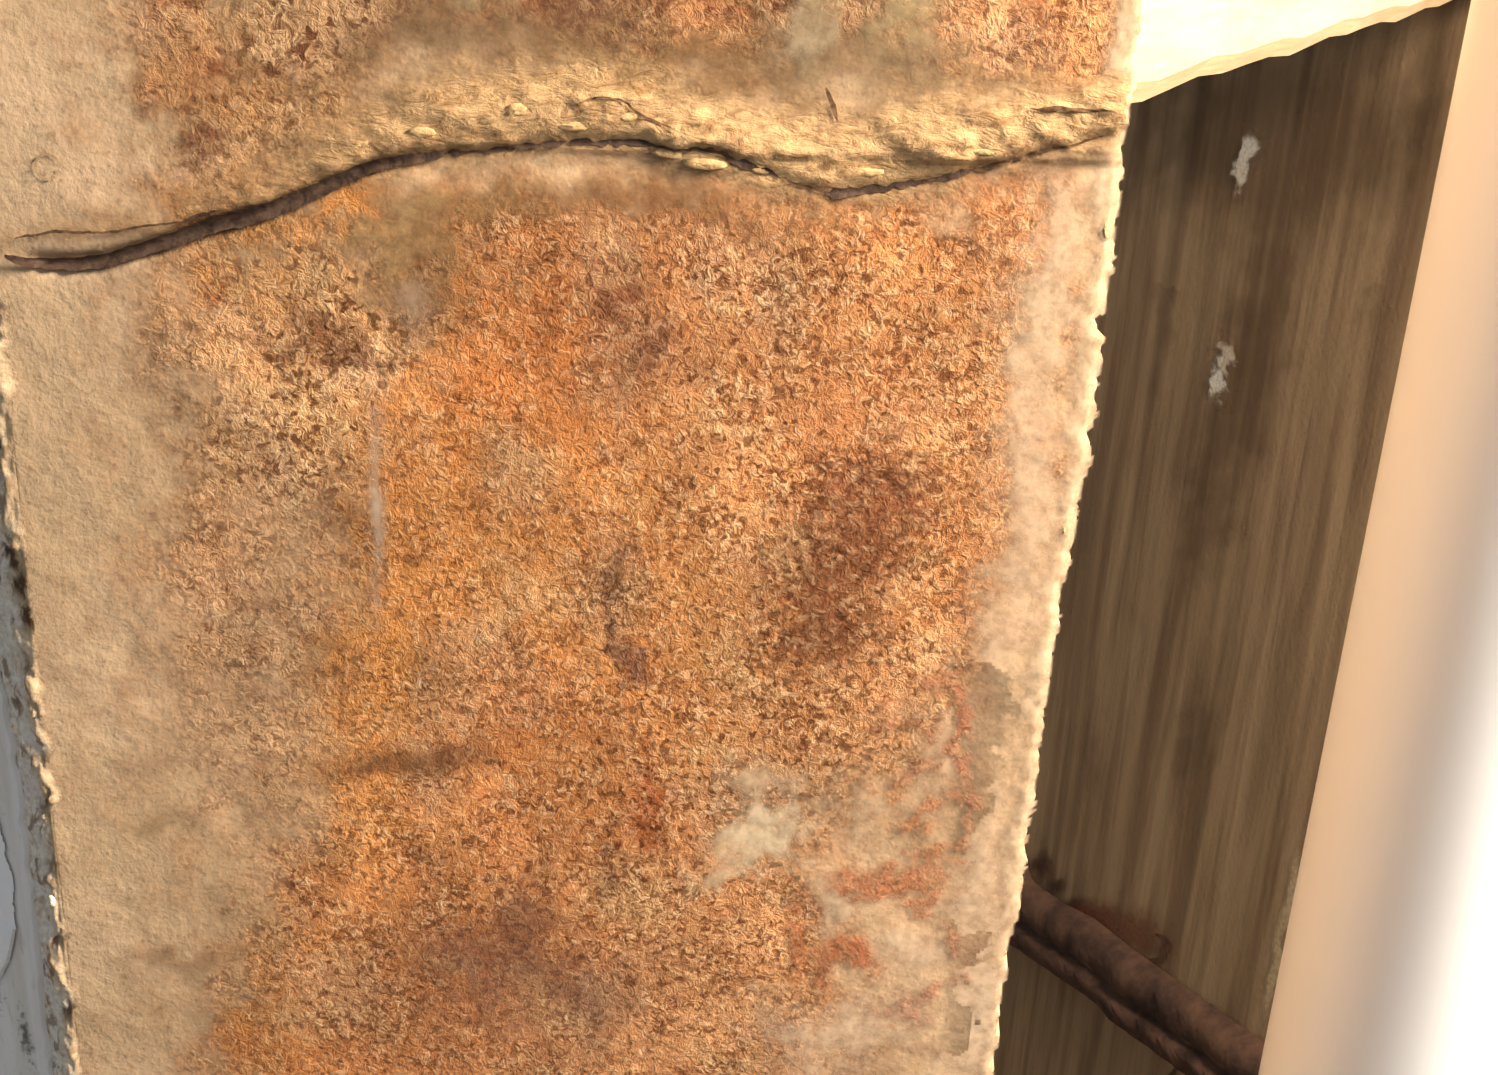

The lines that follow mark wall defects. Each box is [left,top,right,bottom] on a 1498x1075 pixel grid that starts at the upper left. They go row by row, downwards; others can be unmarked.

crack [4,96,1116,272]
crack [825,87,838,121]
spalling [0,277,82,1075]
corrosion [118,0,1139,1075]
leakage [752,453,935,685]
leakage [983,197,1076,700]
leakage [706,806,787,885]
leakage [786,1007,884,1050]
leakage [955,793,1002,1066]